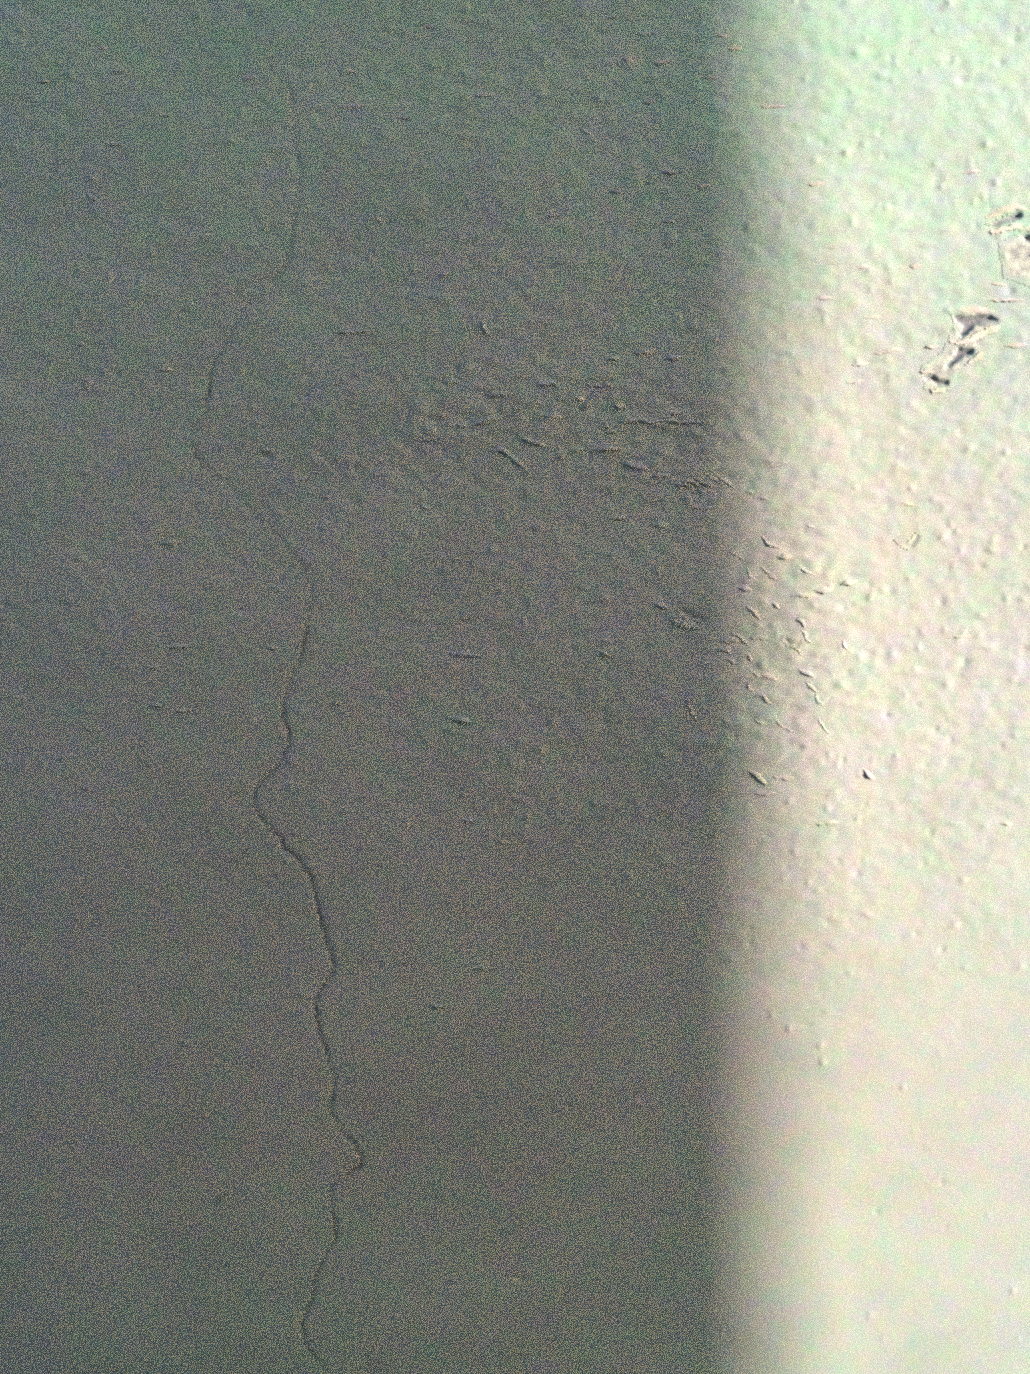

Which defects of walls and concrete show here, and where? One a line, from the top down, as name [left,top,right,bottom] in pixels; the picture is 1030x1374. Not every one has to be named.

spalling [985,203,1030,286]
spalling [921,305,1005,394]
crack [188,84,452,1374]